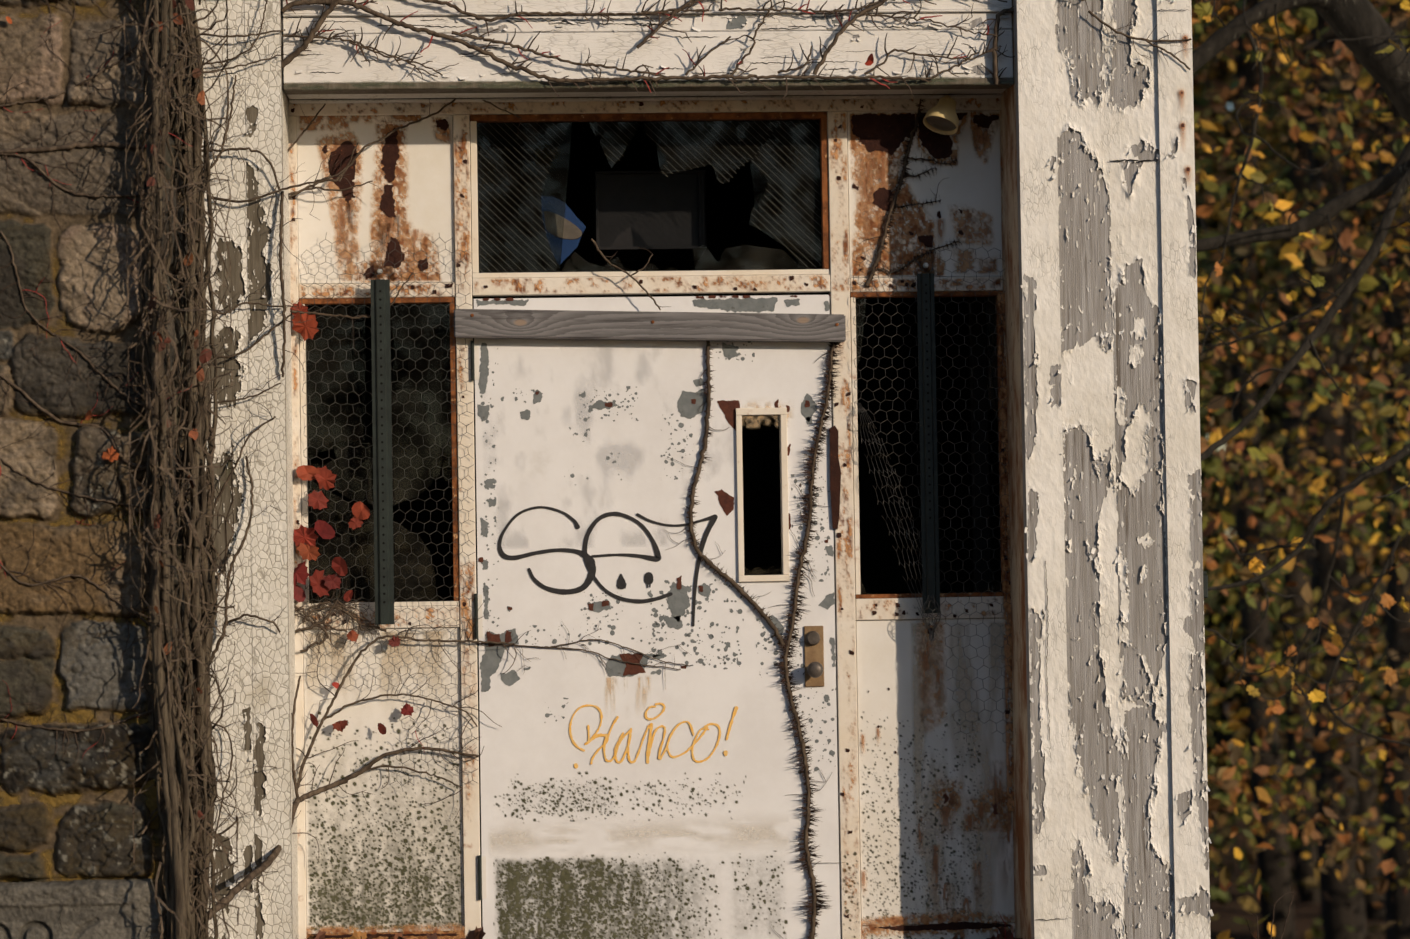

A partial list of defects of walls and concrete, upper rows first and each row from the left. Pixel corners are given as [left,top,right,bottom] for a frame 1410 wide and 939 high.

peeling [1055,0,1150,110]
peeling [206,162,273,410]
peeling [212,445,244,597]
rust [290,98,1015,849]
peeling [477,341,837,774]
peeling [1020,127,1214,939]
peeling [213,707,267,939]
rust [844,818,1015,939]